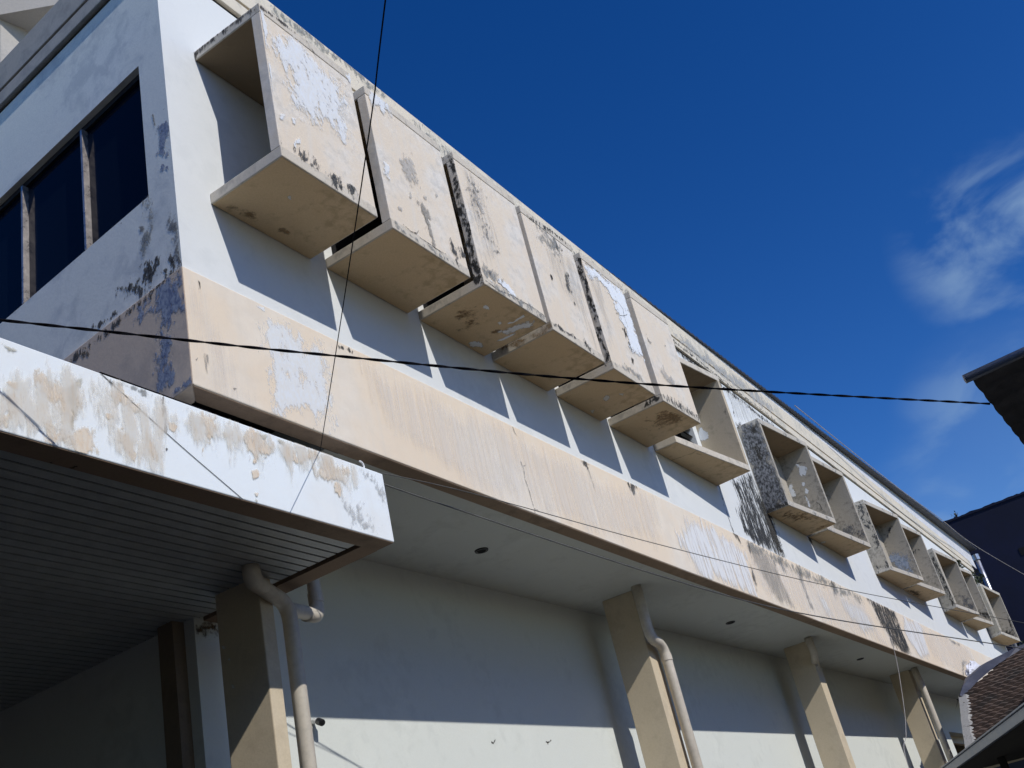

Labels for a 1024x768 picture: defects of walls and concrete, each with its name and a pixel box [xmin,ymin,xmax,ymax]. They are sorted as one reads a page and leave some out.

peeling [261,11,351,144]
peeling [0,365,99,454]
mould [69,196,182,363]
peeling [98,274,358,496]
peeling [498,315,534,341]
leakage [395,120,643,382]
peeling [583,264,645,363]
peeling [675,515,758,597]
leakage [665,335,909,653]